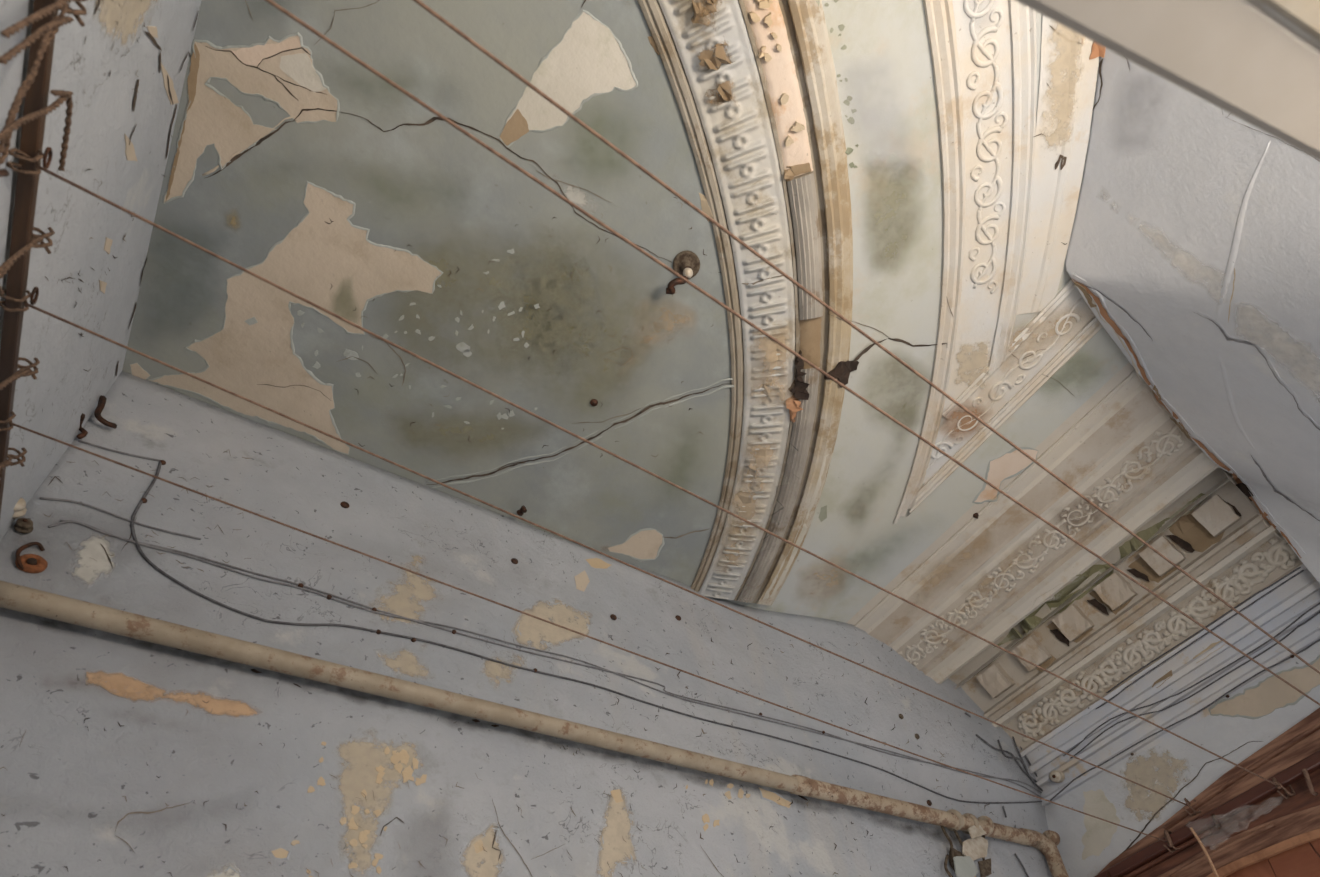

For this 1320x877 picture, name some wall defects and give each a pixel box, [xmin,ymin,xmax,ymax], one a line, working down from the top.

peeling [163,32,340,204]
peeling [498,10,638,147]
crack [1034,133,1067,170]
crack [1049,25,1130,111]
peeling [130,181,459,455]
leakage [406,255,551,343]
crack [1194,310,1320,430]
crack [425,378,734,488]
crack [1251,456,1320,521]
peeling [574,528,665,592]
peeling [485,600,589,683]
peeling [306,742,427,877]